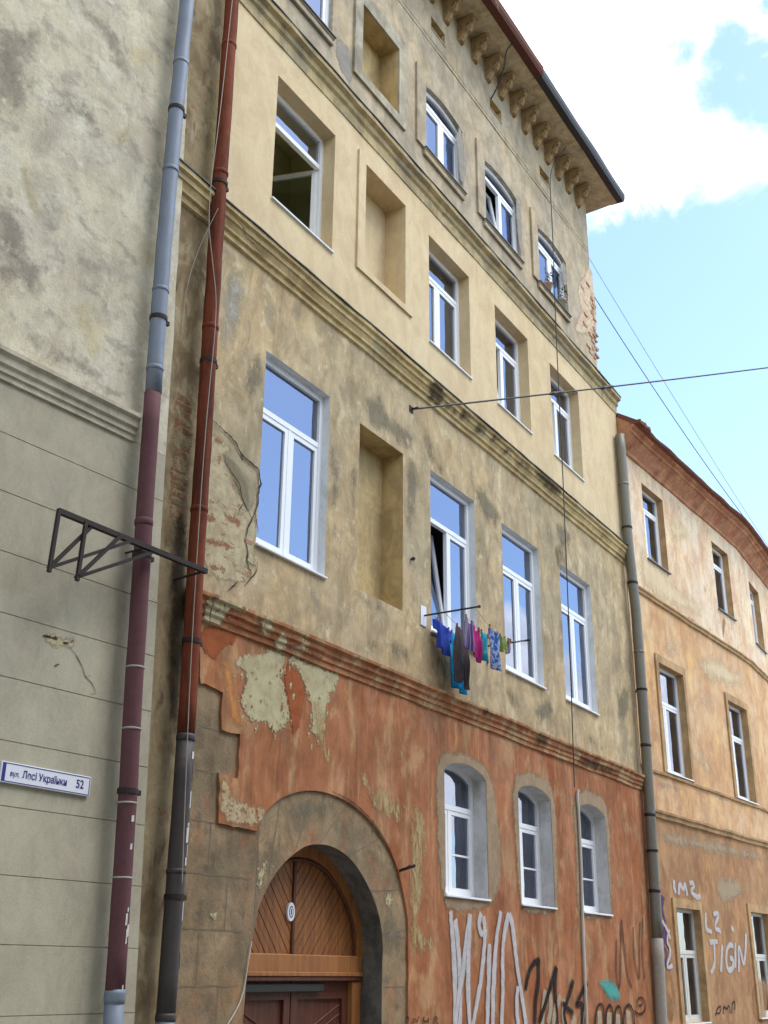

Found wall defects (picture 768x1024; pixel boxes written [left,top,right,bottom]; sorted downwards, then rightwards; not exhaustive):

spalling [575,268,601,373]
spalling [170,394,193,528]
spalling [205,436,257,586]
crack [209,420,262,618]
peeling [201,593,339,761]
peeling [221,780,265,826]
peeling [363,773,434,954]